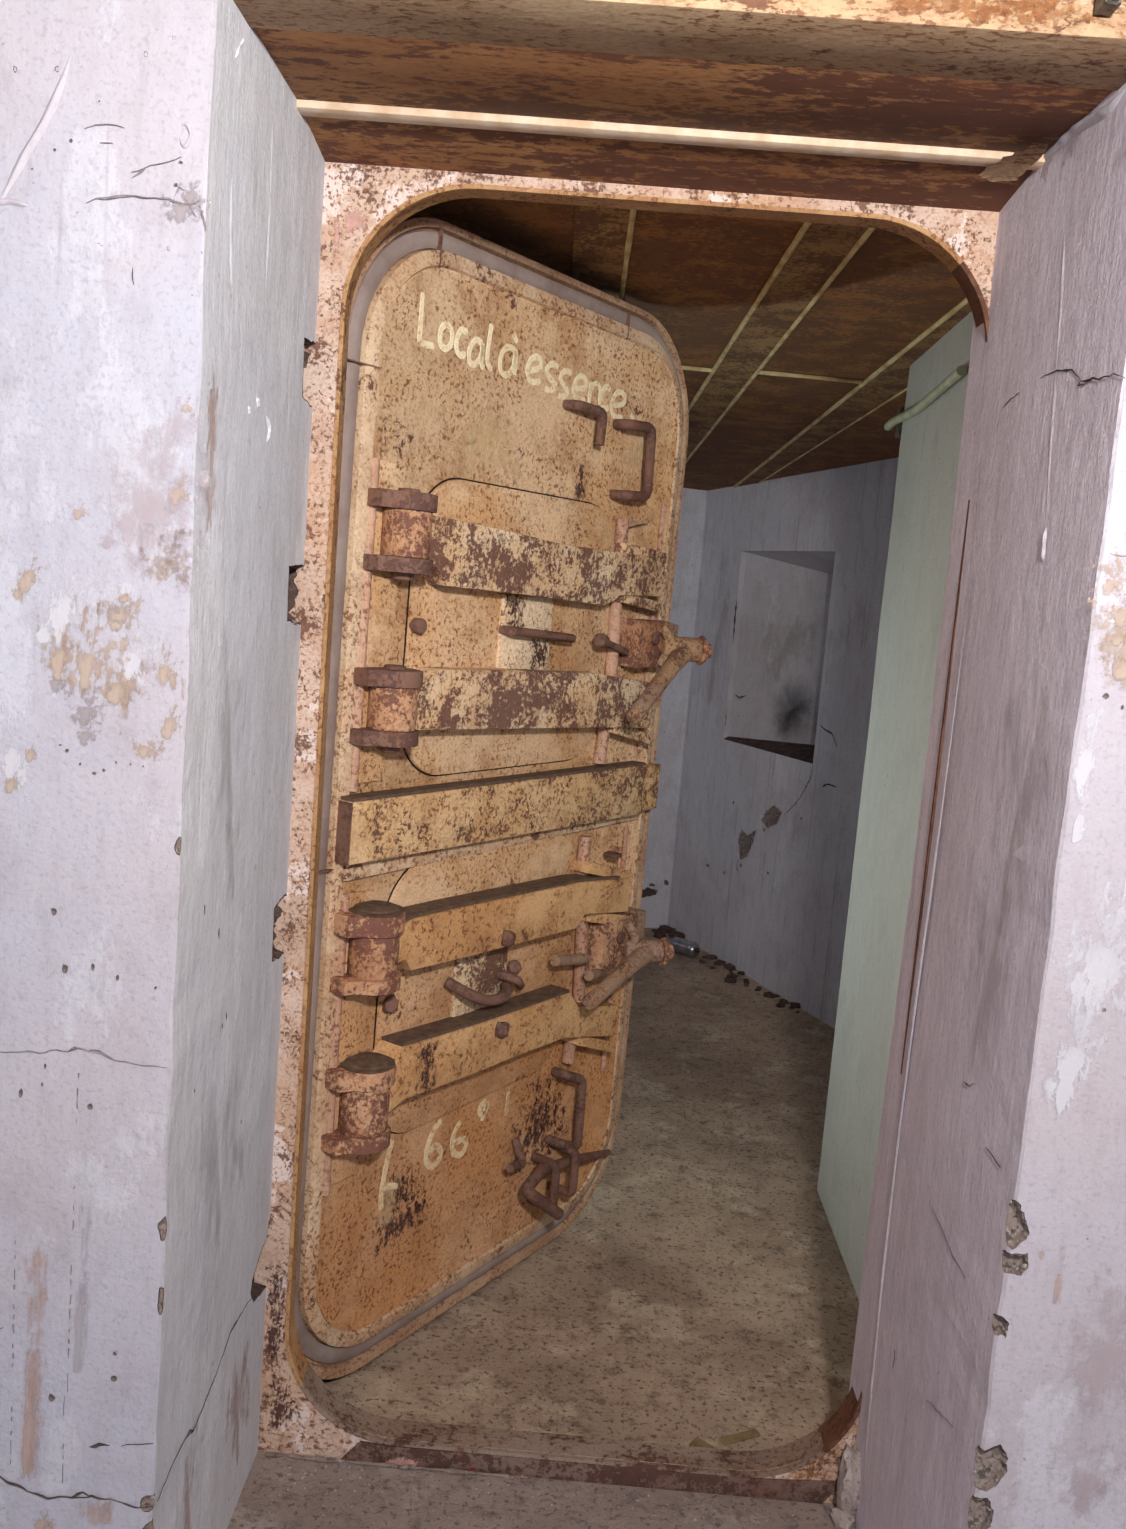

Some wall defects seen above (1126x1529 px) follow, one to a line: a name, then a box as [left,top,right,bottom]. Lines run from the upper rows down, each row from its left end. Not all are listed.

rust [886,0,1101,23]
crack [1003,369,1125,408]
peeling [13,557,40,601]
peeling [36,557,184,775]
peeling [1072,559,1126,843]
peeling [1,703,36,793]
peeling [1044,880,1126,1118]
crack [0,1046,167,1068]
spalling [1001,1200,1028,1275]
spalling [992,1315,1008,1337]
crack [0,1299,251,1508]
spalling [968,1445,1007,1529]